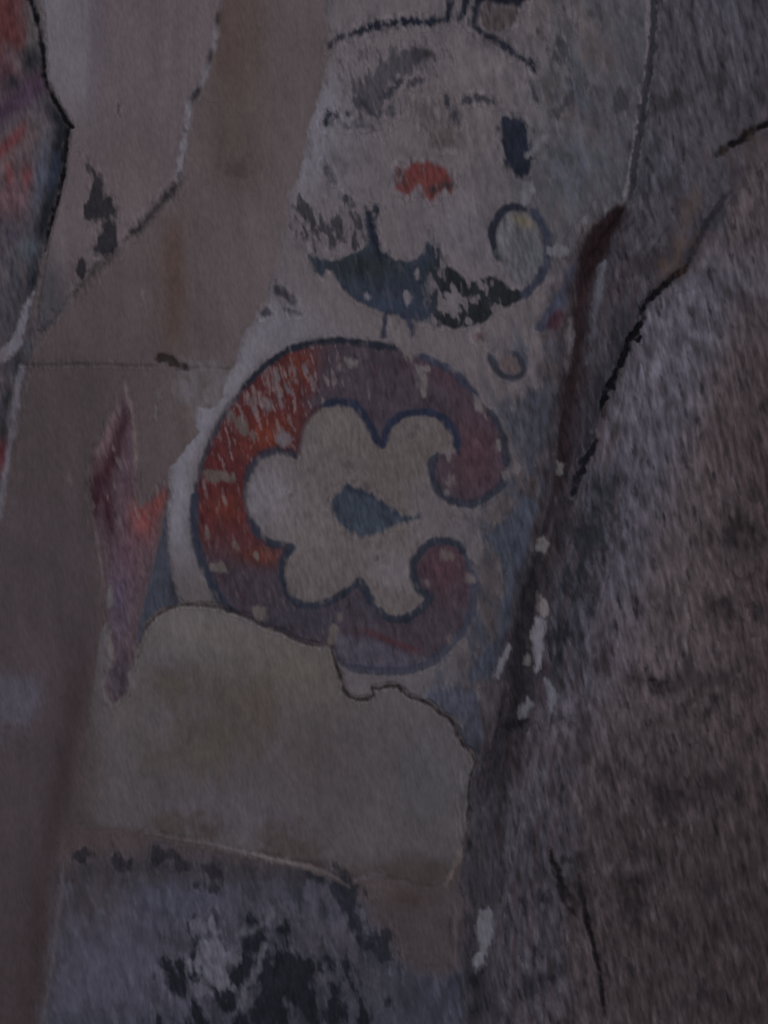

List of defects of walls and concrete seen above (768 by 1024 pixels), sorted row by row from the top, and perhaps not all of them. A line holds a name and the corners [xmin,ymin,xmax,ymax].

crack [23,0,77,255]
peeling [279,182,375,265]
peeling [517,176,538,211]
peeling [381,264,433,400]
peeling [439,288,478,330]
peeling [244,357,313,453]
crack [567,281,676,500]